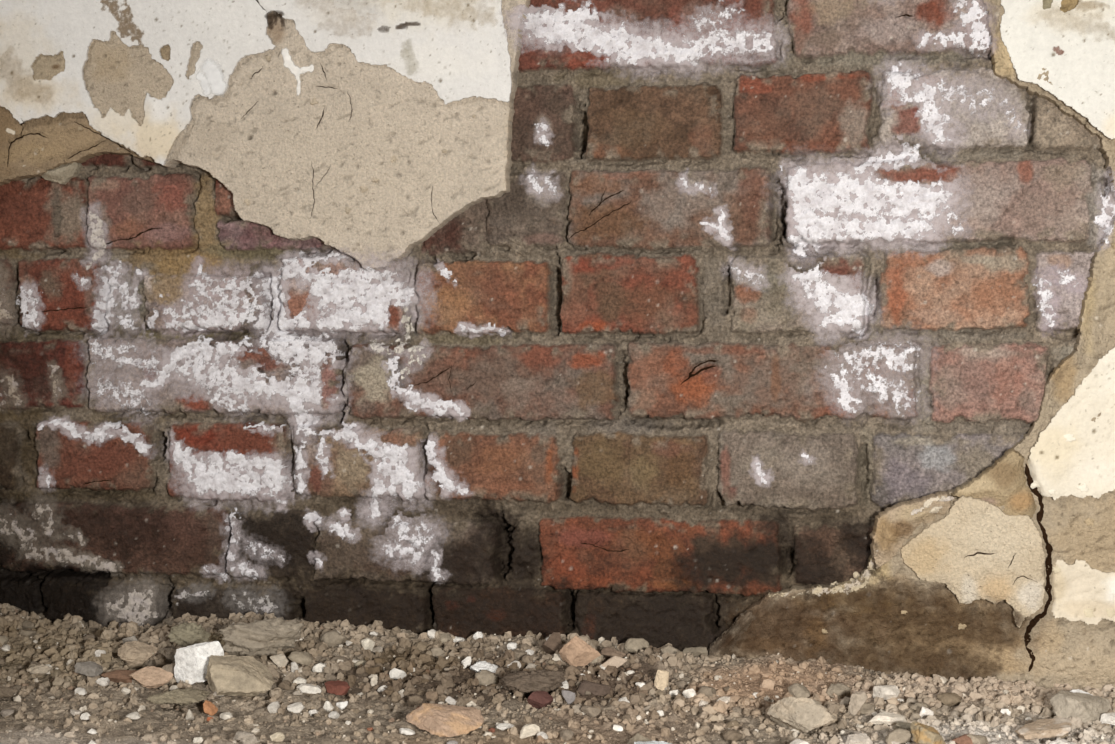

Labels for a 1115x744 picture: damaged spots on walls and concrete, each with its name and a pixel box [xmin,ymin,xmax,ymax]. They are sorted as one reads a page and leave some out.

spalling [0,0,530,270]
spalling [982,0,1115,199]
leakage [0,205,1025,680]
spalling [727,216,1115,691]
crack [964,464,1053,672]